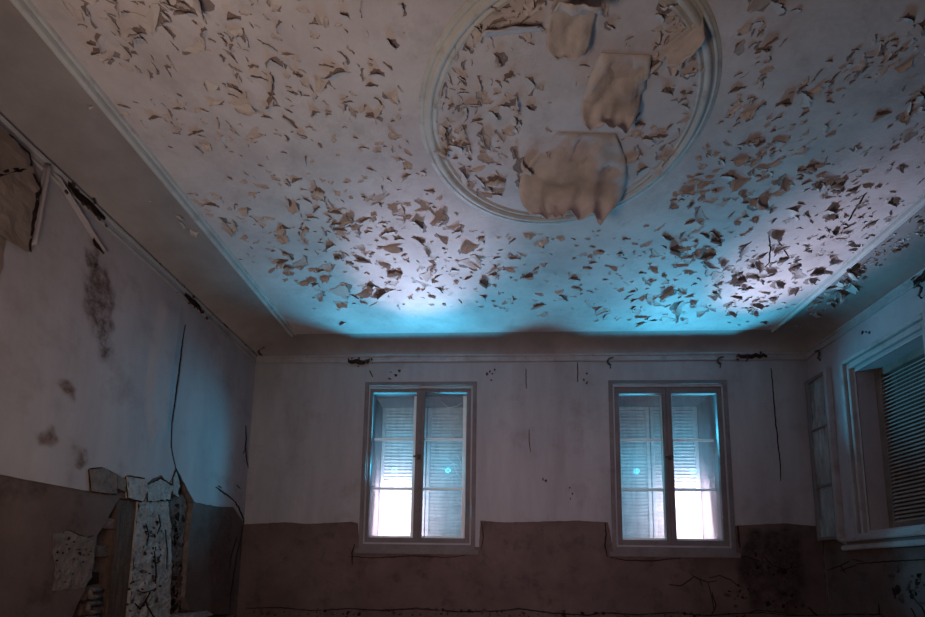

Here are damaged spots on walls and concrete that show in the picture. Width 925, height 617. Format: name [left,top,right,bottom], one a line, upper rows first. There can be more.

peeling [62,0,925,327]
flaking render [125,494,214,617]